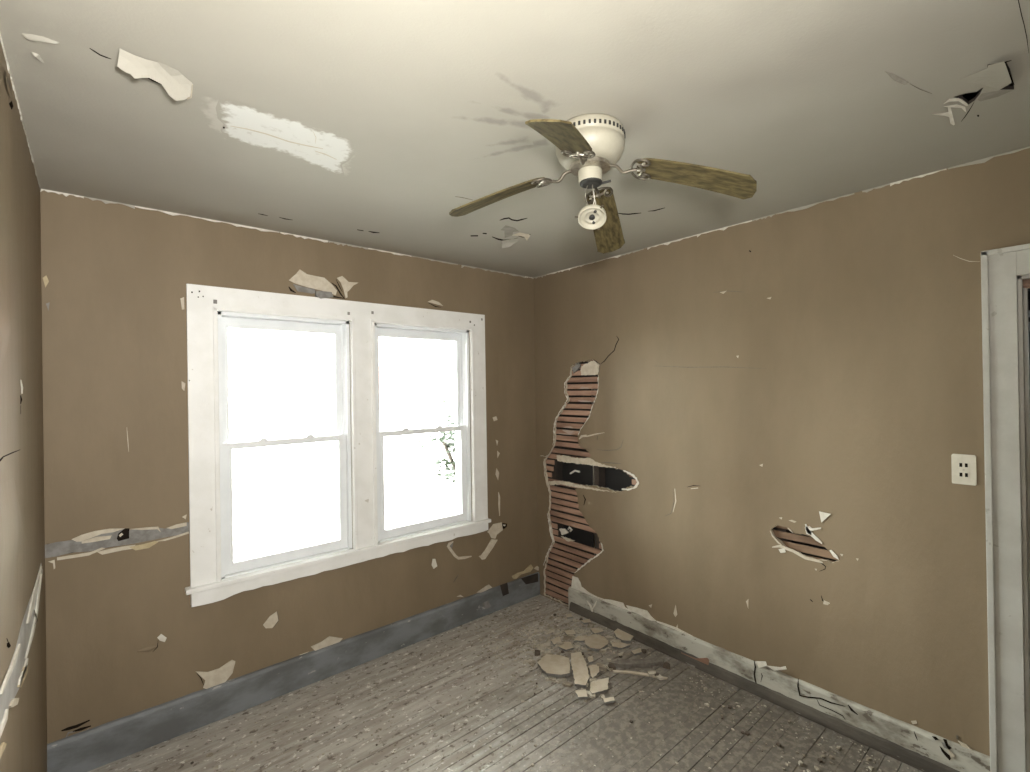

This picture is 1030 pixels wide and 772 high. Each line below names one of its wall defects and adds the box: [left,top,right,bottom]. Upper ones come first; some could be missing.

peeling [0,32,1030,278]
peeling [289,270,357,299]
peeling [447,492,507,560]
flaking render [477,360,693,637]
flaking render [770,511,843,571]
peeling [0,514,189,758]
peeling [196,660,235,689]